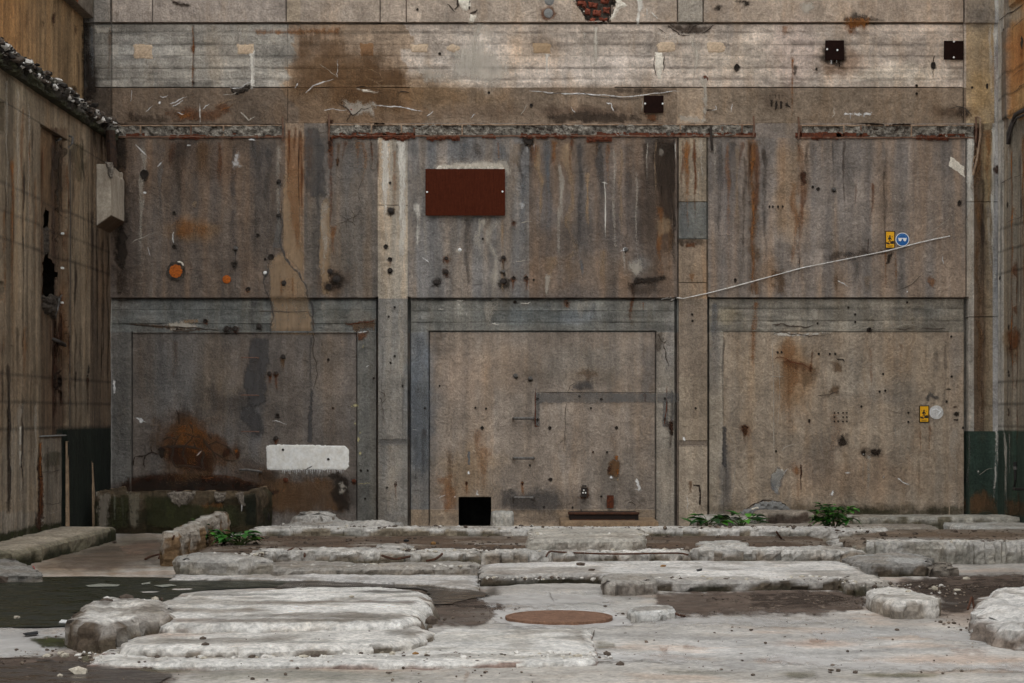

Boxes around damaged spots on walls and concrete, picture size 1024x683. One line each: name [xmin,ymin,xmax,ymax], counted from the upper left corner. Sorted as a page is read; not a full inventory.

spalling [574,0,627,24]
rust [520,101,759,307]
leakage [644,140,676,256]
crack [348,319,376,340]
rust [158,414,239,476]